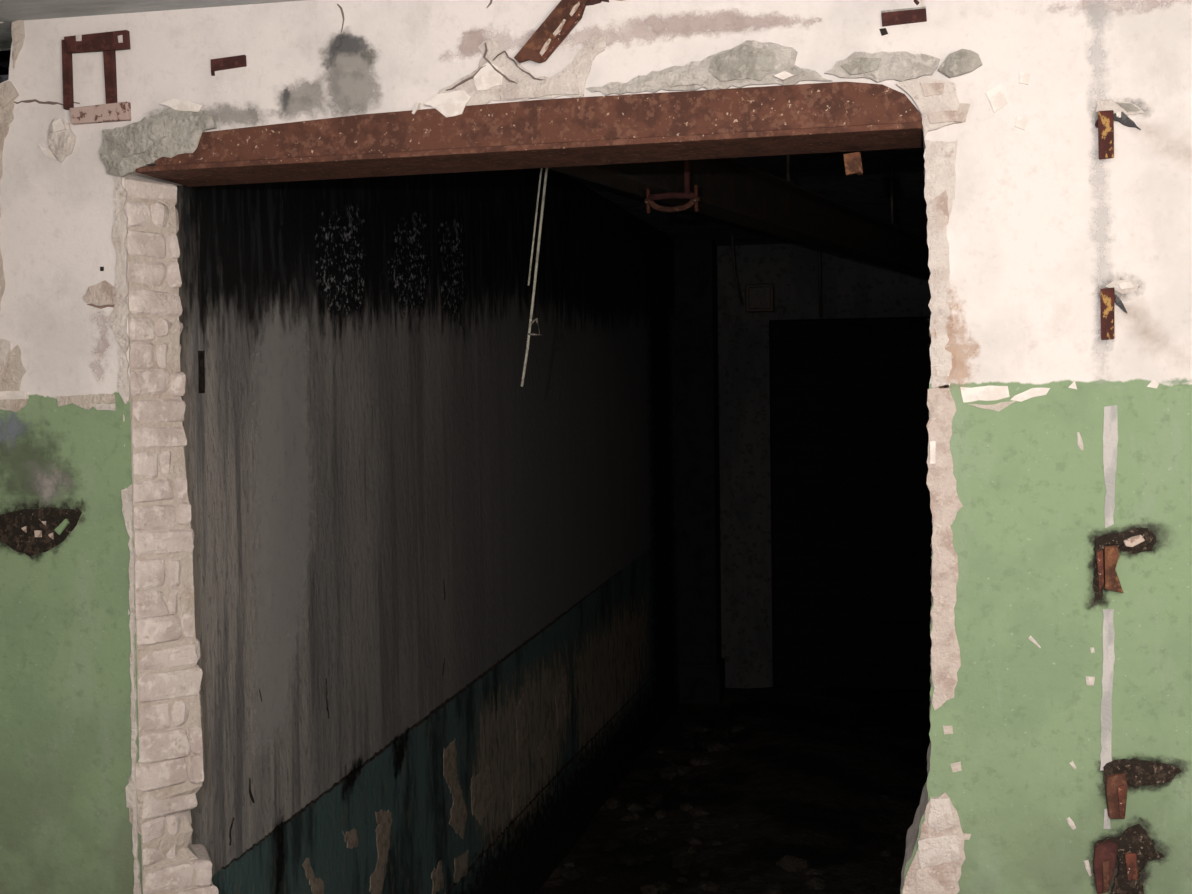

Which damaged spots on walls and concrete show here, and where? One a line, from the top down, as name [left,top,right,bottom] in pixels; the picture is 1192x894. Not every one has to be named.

water stain [280,33,380,115]
flaking render [423,35,607,117]
flaking render [896,76,1050,710]
peeling [21,519,69,539]
spalling [902,792,971,894]